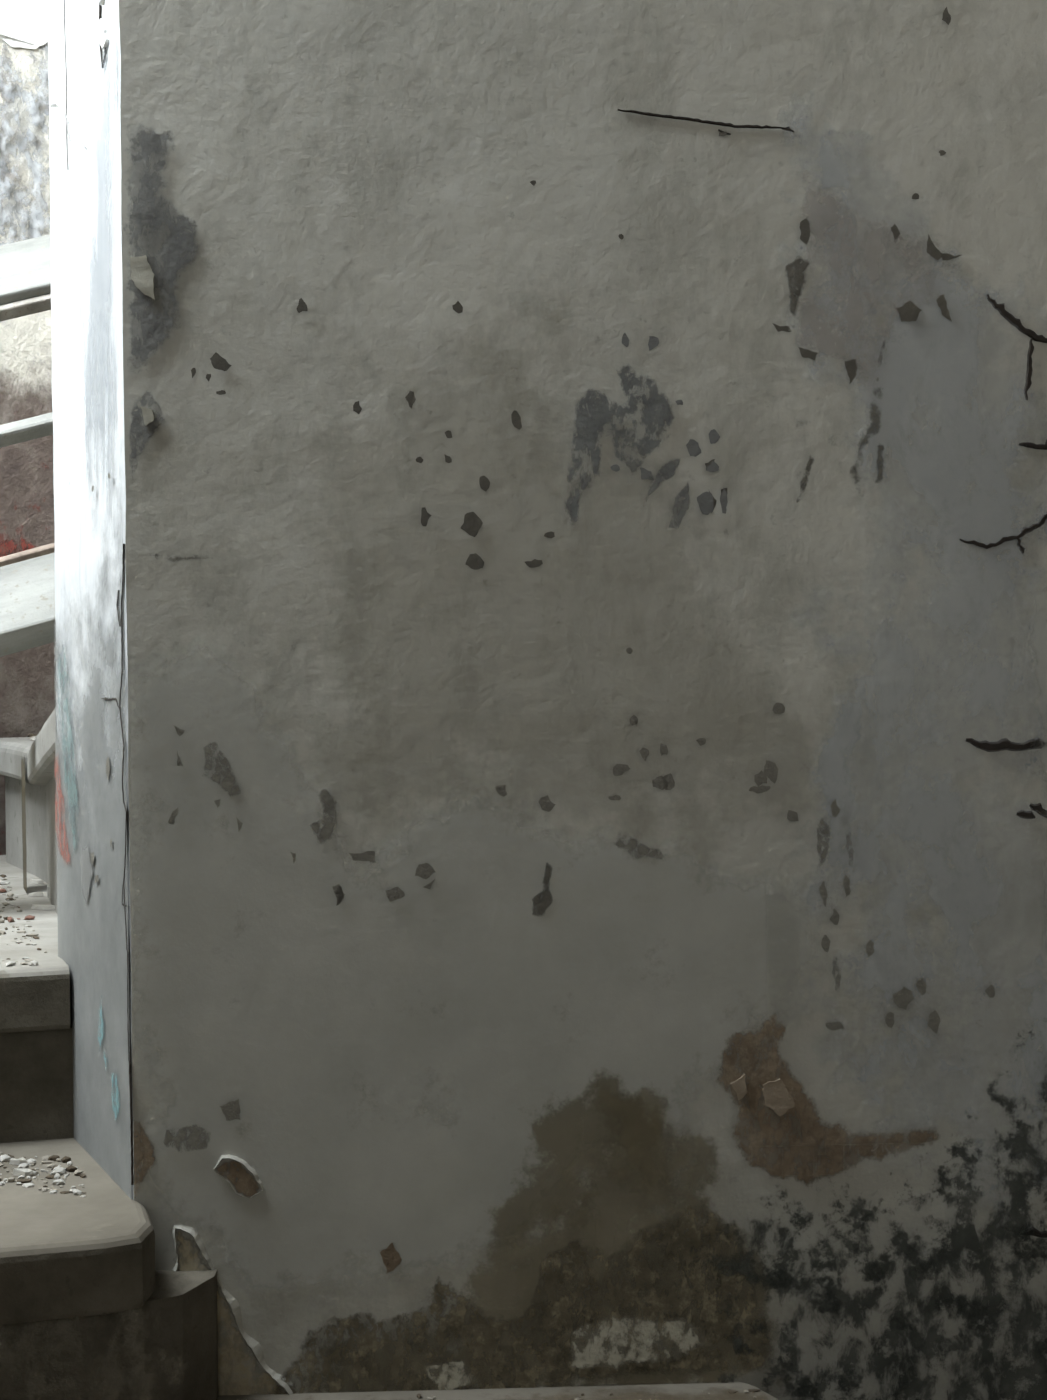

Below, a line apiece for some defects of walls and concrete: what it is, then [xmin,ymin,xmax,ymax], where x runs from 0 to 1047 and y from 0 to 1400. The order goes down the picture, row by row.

crack [618,109,794,135]
peeling [127,126,199,362]
peeling [772,218,810,332]
peeling [566,366,728,527]
crack [960,513,1047,554]
crack [101,544,134,1185]
crack [966,737,1047,752]
crack [1016,803,1047,819]
spalling [133,1120,264,1198]
spalling [172,1206,771,1396]
water stain [308,1076,1047,1400]
spalling [718,1015,939,1185]